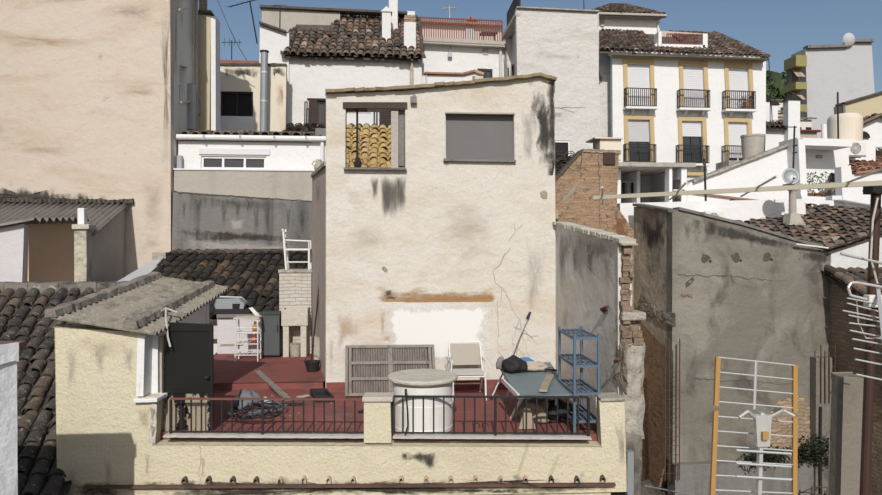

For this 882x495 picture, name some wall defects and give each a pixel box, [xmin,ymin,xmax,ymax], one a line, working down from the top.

leakage [536,82,556,175]
leakage [0,188,64,199]
leakage [373,182,404,208]
leakage [643,222,665,248]
crack [492,225,539,357]
spalling [613,212,676,395]